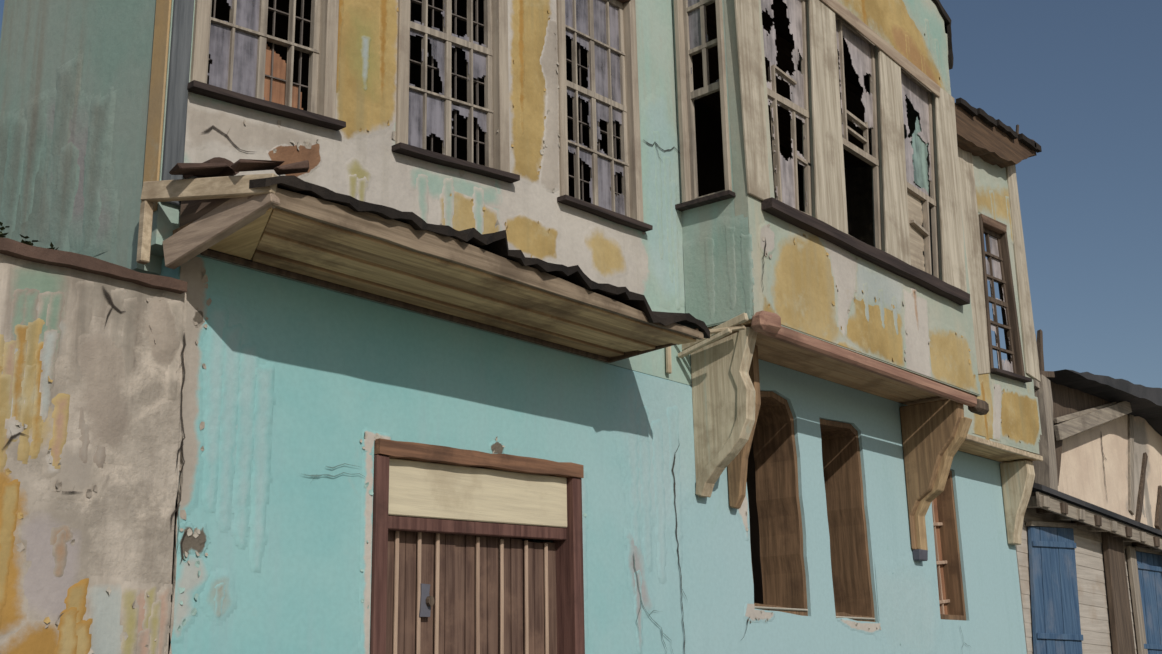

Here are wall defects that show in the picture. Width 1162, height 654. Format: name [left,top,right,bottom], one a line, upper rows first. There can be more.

peeling [183,0,652,299]
peeling [837,0,951,95]
peeling [0,256,212,654]
crack [103,288,125,325]
crack [171,332,186,558]
crack [304,463,363,477]
crack [633,444,687,654]
peeling [758,221,1042,452]